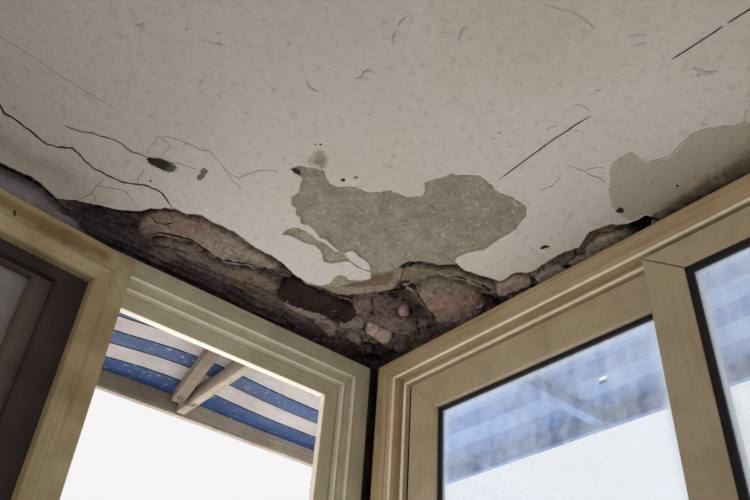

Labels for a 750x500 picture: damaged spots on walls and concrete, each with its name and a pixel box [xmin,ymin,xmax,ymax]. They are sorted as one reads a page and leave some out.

crack [0,104,277,209]
water stain [652,160,750,224]
spalling [0,162,653,374]